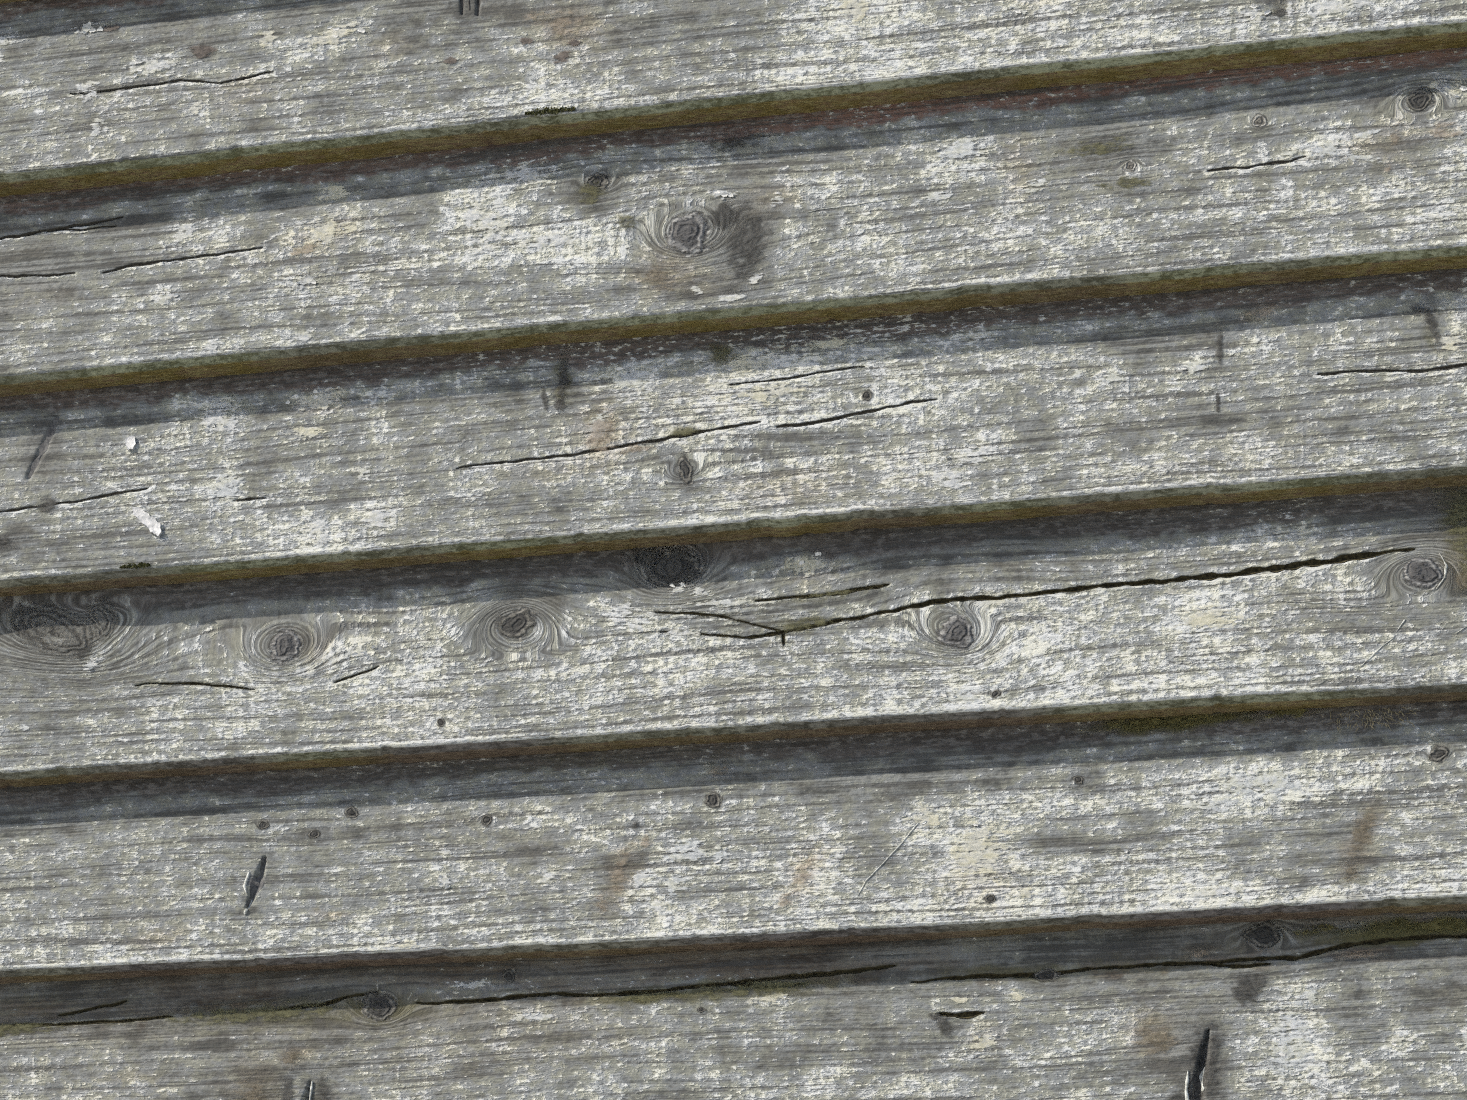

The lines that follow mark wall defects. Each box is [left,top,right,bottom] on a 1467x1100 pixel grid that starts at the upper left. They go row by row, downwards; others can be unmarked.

crack [70,71,273,94]
crack [0,217,123,239]
crack [0,247,263,277]
crack [729,366,865,385]
crack [1317,363,1467,375]
crack [456,399,936,469]
crack [0,488,148,512]
crack [655,548,1414,645]
crack [416,934,1467,1018]
crack [275,991,378,1010]
crack [11,1001,173,1027]